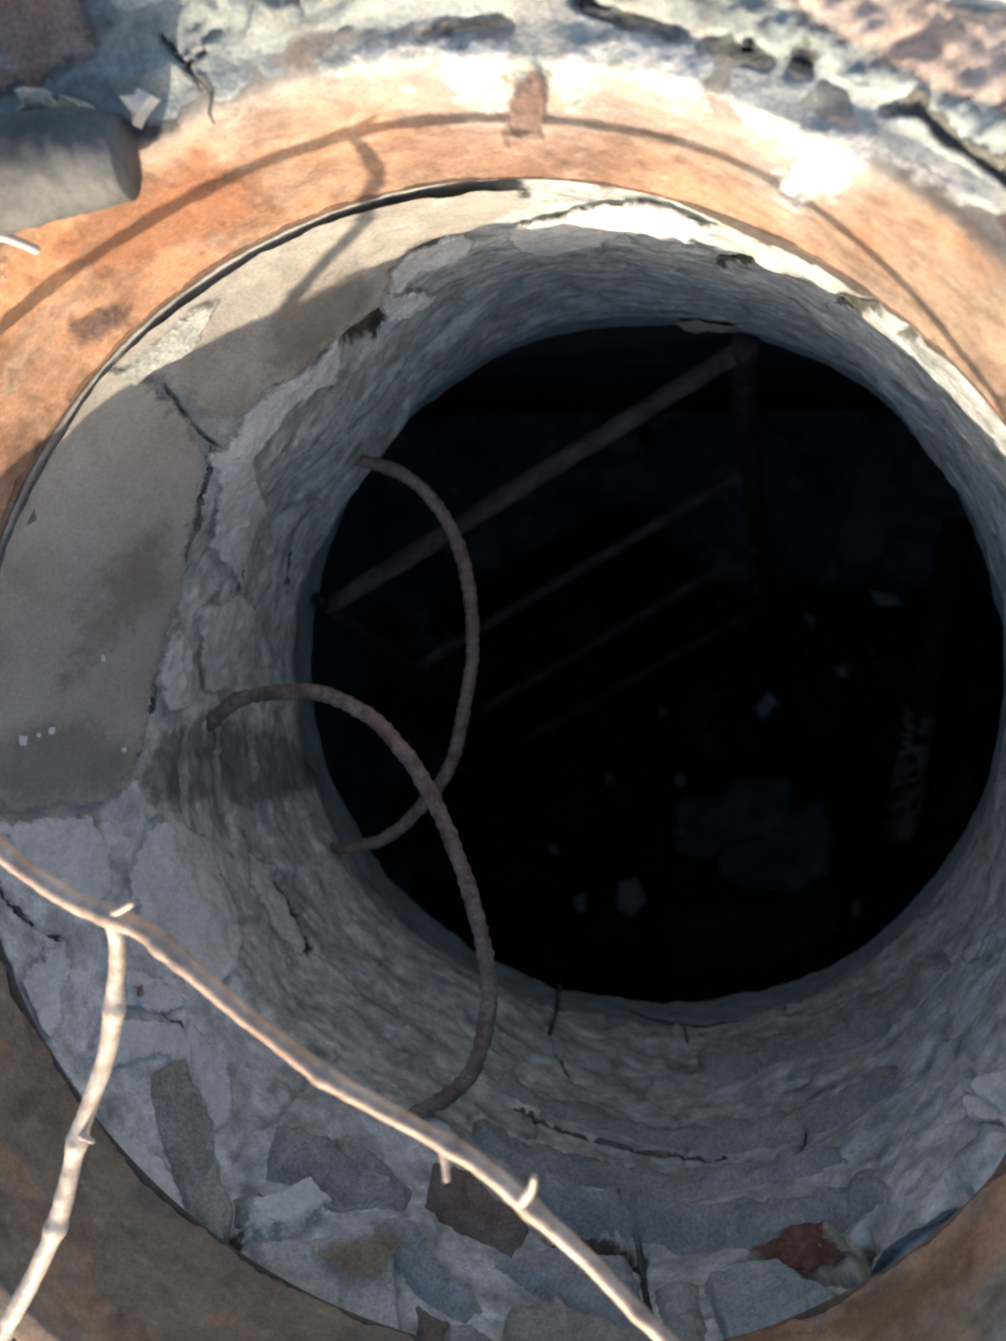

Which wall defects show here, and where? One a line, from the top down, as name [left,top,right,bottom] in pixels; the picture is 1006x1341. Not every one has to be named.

spalling [790,42,819,69]
crack [158,33,215,125]
corrosion [501,71,549,148]
spalling [127,120,177,142]
crack [889,89,1006,183]
corrosion [997,213,1006,231]
spalling [716,254,754,268]
spalling [837,293,880,315]
corrosion [68,308,129,349]
spalling [343,308,385,343]
spalling [581,1237,647,1276]
corrosion [751,1222,851,1271]